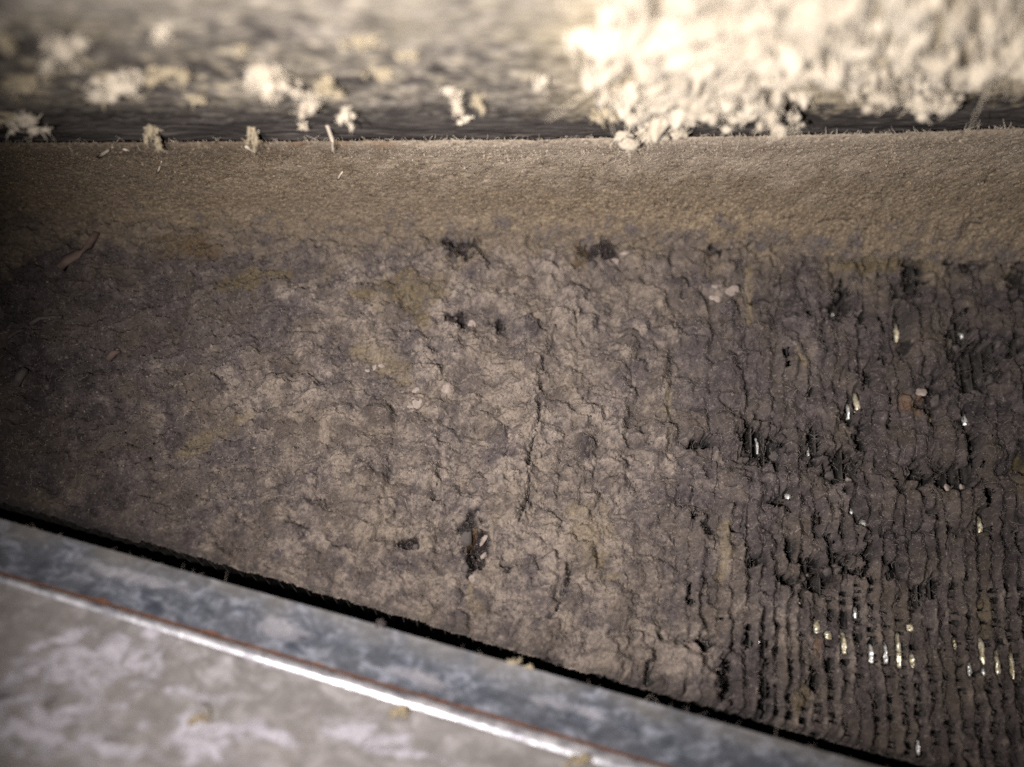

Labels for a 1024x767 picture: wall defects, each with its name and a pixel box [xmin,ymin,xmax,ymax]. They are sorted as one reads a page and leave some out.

crack [519,358,544,519]